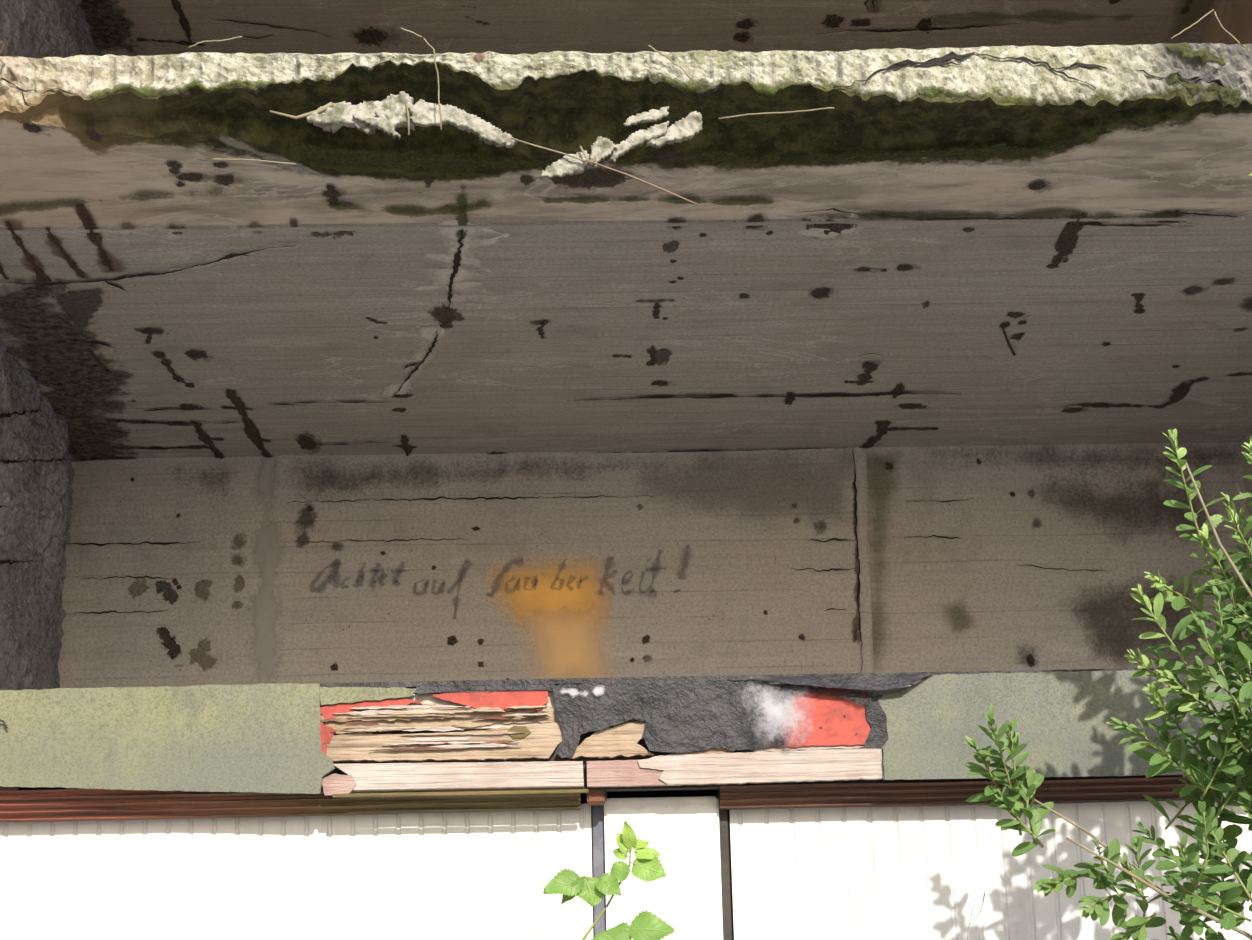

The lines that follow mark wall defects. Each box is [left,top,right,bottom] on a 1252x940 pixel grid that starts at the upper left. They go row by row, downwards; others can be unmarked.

crack [820,0,1107,99]
crack [1138,66,1230,88]
spalling [22,123,42,133]
spalling [166,161,233,188]
spalling [520,168,633,190]
crack [4,246,295,291]
crack [134,228,464,424]
water stain [1068,485,1206,527]
crack [612,448,863,673]
water stain [1083,588,1199,658]
peeling [320,678,548,754]
peeling [769,686,871,748]